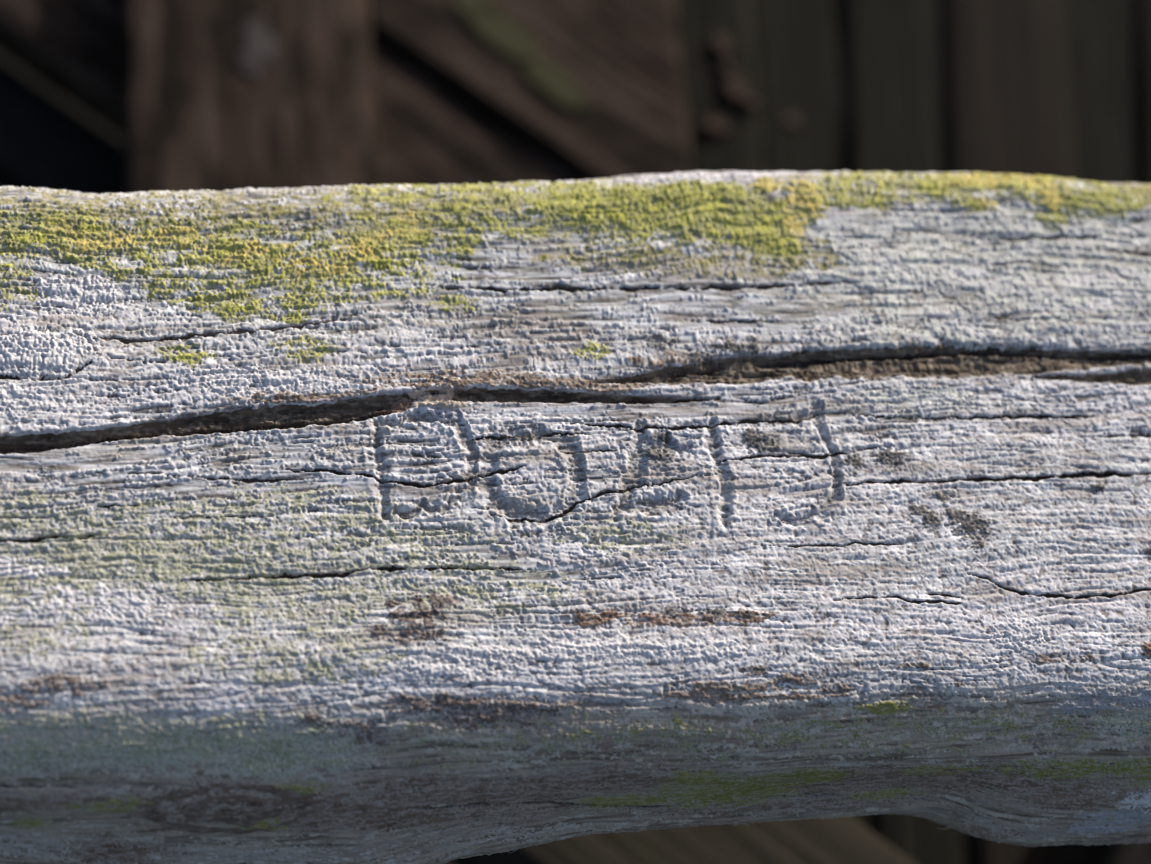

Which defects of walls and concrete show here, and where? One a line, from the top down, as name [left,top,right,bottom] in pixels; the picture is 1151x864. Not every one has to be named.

crack [413,281,856,294]
crack [0,314,1151,523]
crack [0,504,278,543]
crack [833,574,1151,605]